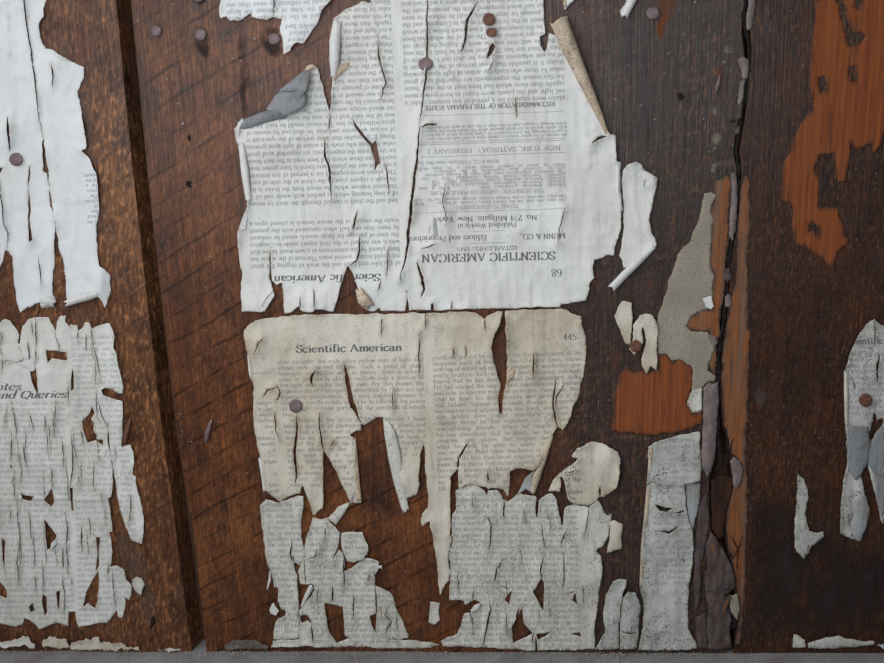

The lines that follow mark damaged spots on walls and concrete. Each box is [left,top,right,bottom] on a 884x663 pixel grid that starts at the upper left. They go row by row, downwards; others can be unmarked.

peeling [620,0,637,18]
crack [729,0,751,211]
peeling [781,0,884,270]
peeling [260,164,751,651]
crack [716,234,743,472]
peeling [132,577,145,595]
crack [720,535,743,570]
crack [729,604,738,629]